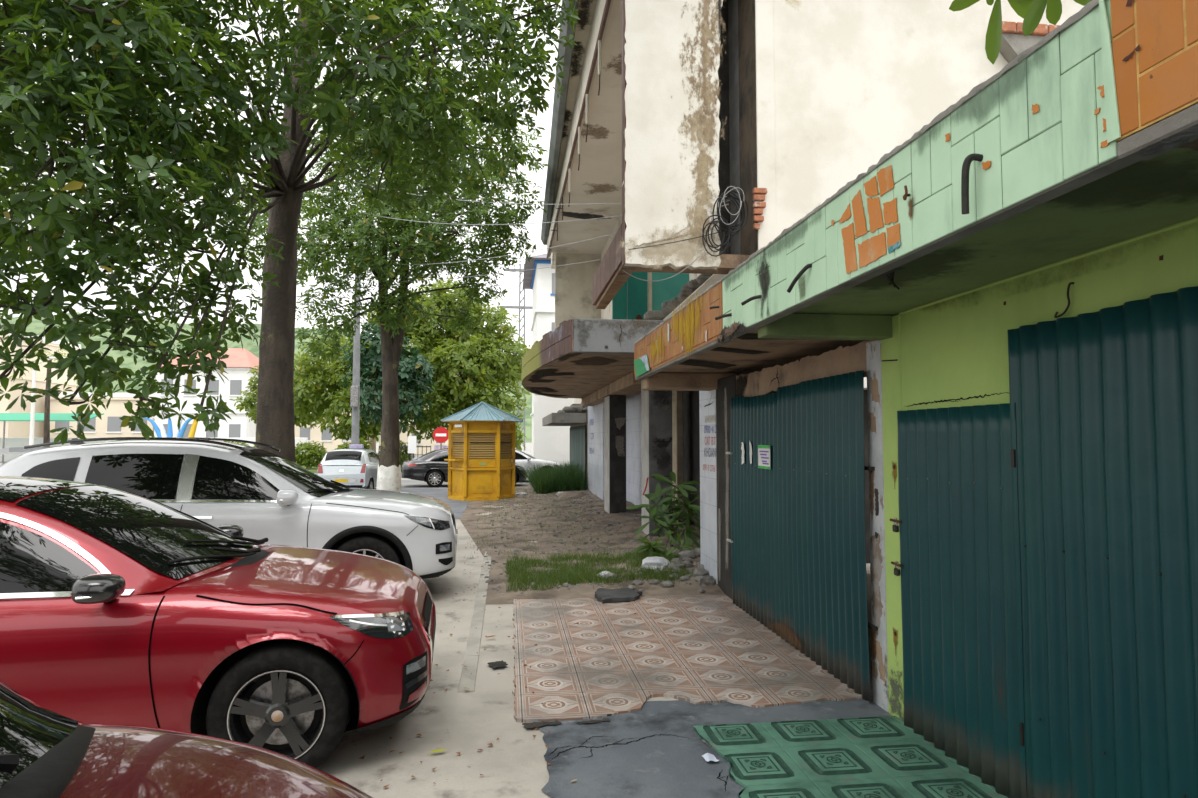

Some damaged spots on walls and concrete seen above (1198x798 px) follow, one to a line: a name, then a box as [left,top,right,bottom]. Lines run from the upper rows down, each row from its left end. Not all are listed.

peeling [831,165,901,273]
leakage [1047,159,1198,207]
leakage [527,320,660,397]